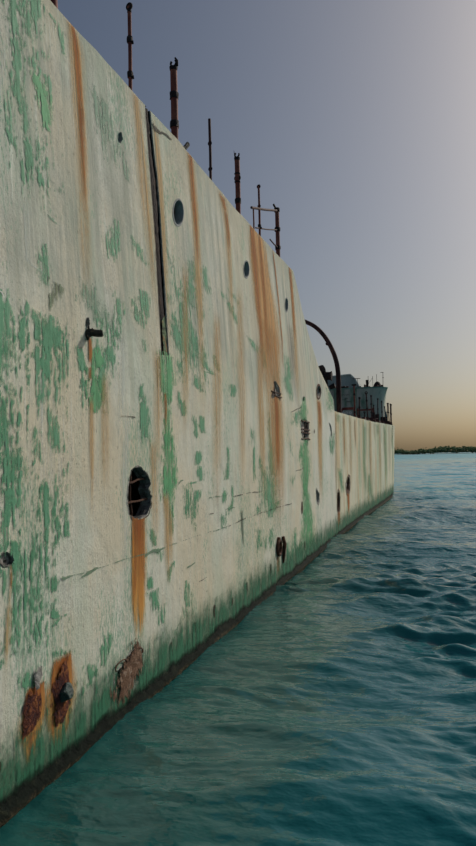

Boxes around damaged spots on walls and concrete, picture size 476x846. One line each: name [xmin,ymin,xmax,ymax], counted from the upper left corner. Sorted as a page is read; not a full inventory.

peeling [0,0,65,224]
corrosion [69,22,88,215]
peeling [0,244,151,690]
corrosion [132,516,147,631]
peeling [147,576,166,624]
peeling [149,528,175,582]
peeling [126,250,239,531]
corrosion [250,226,298,483]
corrosion [19,653,74,761]